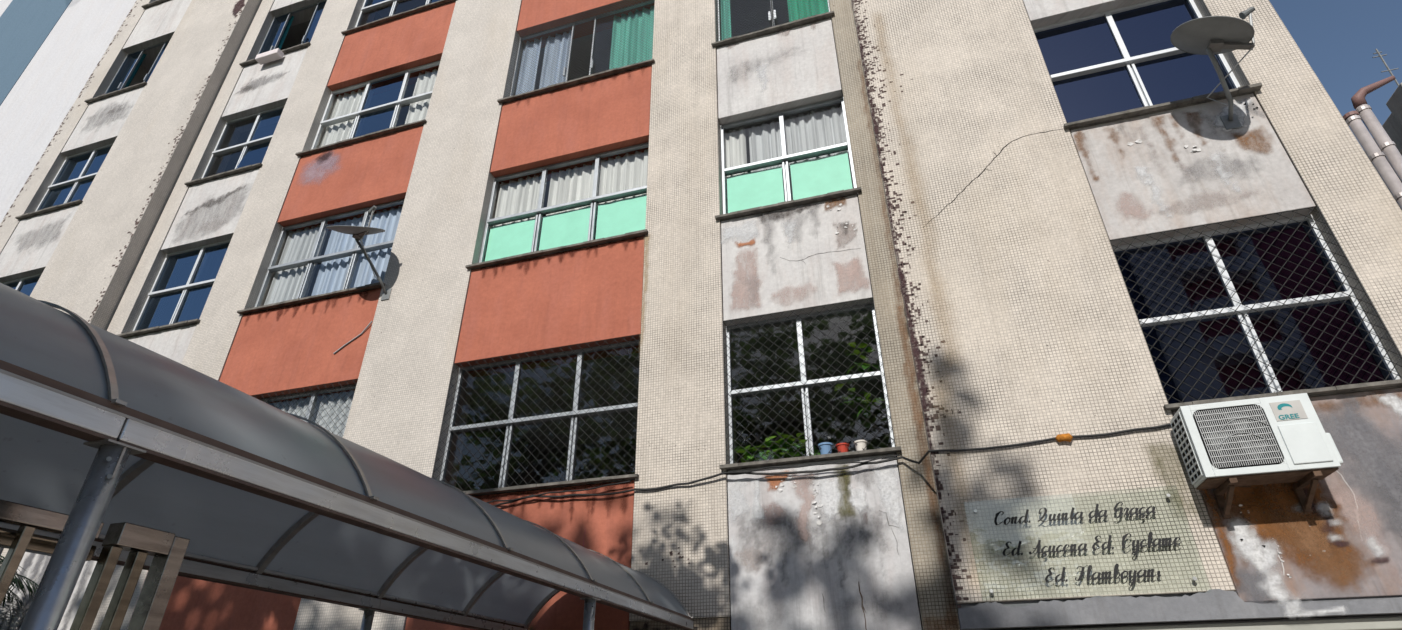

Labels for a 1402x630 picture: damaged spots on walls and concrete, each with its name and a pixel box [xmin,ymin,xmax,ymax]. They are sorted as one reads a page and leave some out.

spalling [825,197,857,247]
crack [927,129,1061,224]
peeling [852,0,972,608]
peeling [730,468,902,541]
damp [837,465,870,520]
corrosion [1202,482,1361,588]
damp [1319,392,1402,536]